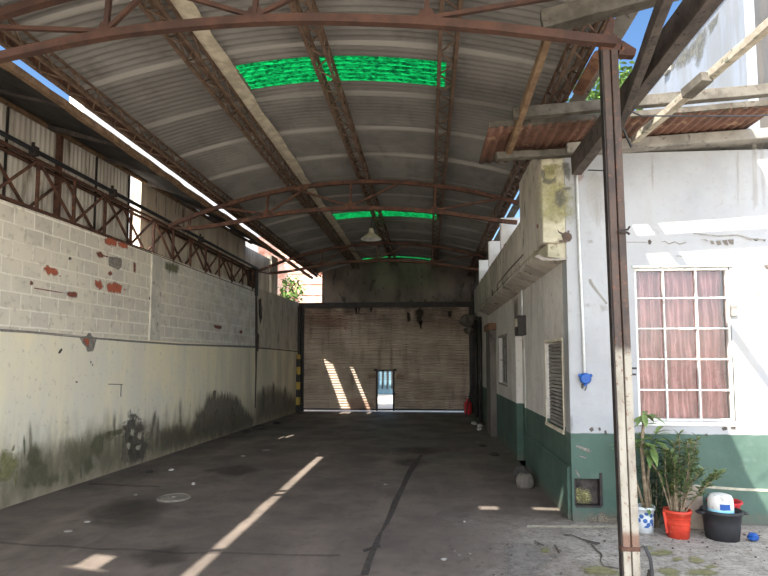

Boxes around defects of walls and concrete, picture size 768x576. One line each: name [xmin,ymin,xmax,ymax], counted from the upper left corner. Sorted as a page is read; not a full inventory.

water stain [555,163,570,207]
peeling [95,280,125,293]
spalling [80,333,97,351]
water stain [149,387,296,449]